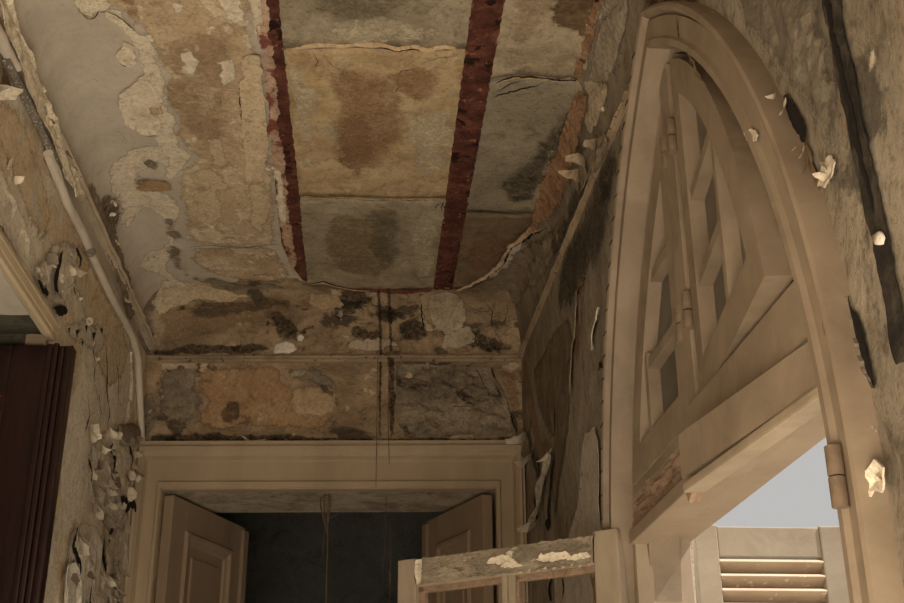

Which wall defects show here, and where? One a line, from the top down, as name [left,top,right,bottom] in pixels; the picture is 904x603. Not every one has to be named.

crack [493,75,578,98]
peeling [0,0,289,385]
water stain [503,123,565,201]
flaking render [471,0,629,306]
water stain [154,299,312,355]
water stain [335,290,376,319]
water stain [376,310,426,340]
peeling [427,290,475,350]
water stain [465,330,510,351]
crack [844,297,875,388]
peeling [61,423,145,603]
peeling [414,427,601,603]